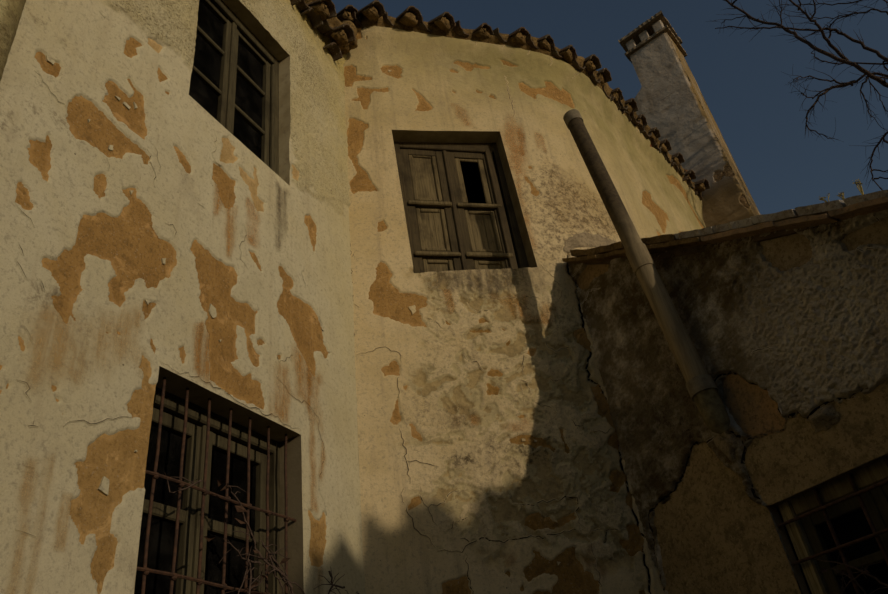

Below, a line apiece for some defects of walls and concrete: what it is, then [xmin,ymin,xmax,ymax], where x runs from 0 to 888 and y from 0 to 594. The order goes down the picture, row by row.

peeling [66,79,150,164]
peeling [347,118,377,194]
peeling [42,188,177,324]
peeling [190,240,265,410]
peeling [277,266,328,376]
peeling [368,262,427,327]
crack [540,255,607,399]
peeling [69,339,156,594]
crack [398,424,607,553]
crack [618,431,761,594]
spalling [653,380,888,594]
crack [714,372,868,430]